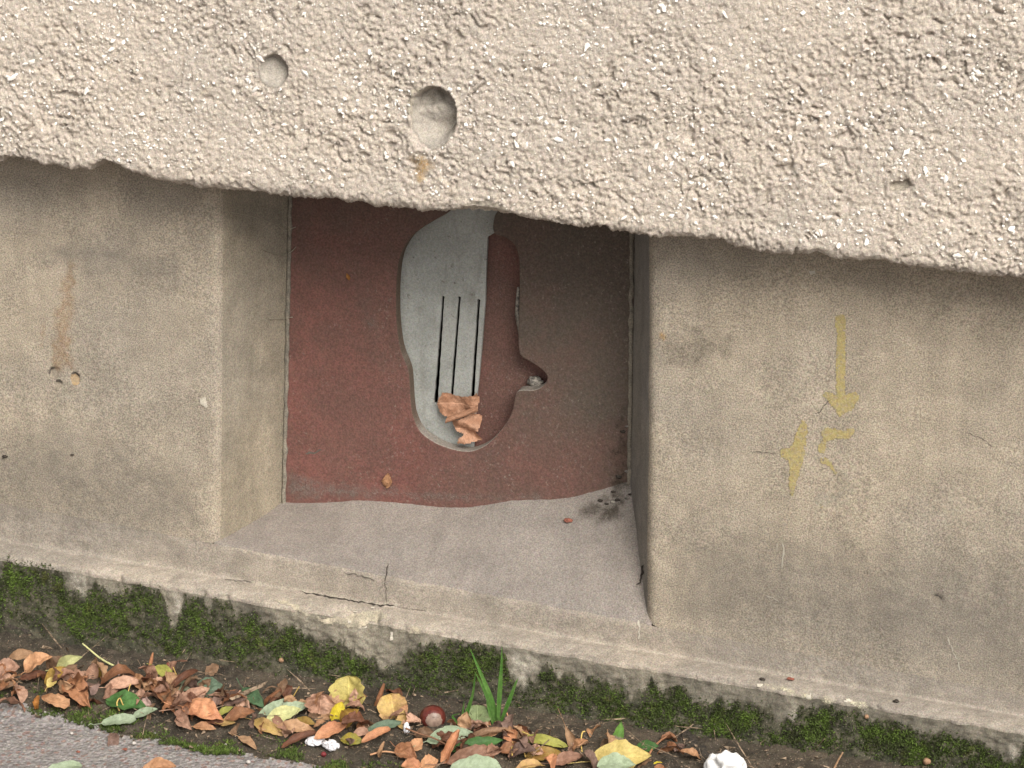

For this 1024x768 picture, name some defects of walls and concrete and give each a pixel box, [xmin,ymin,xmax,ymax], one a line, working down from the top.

spalling [0,0,1024,265]
crack [302,566,426,612]